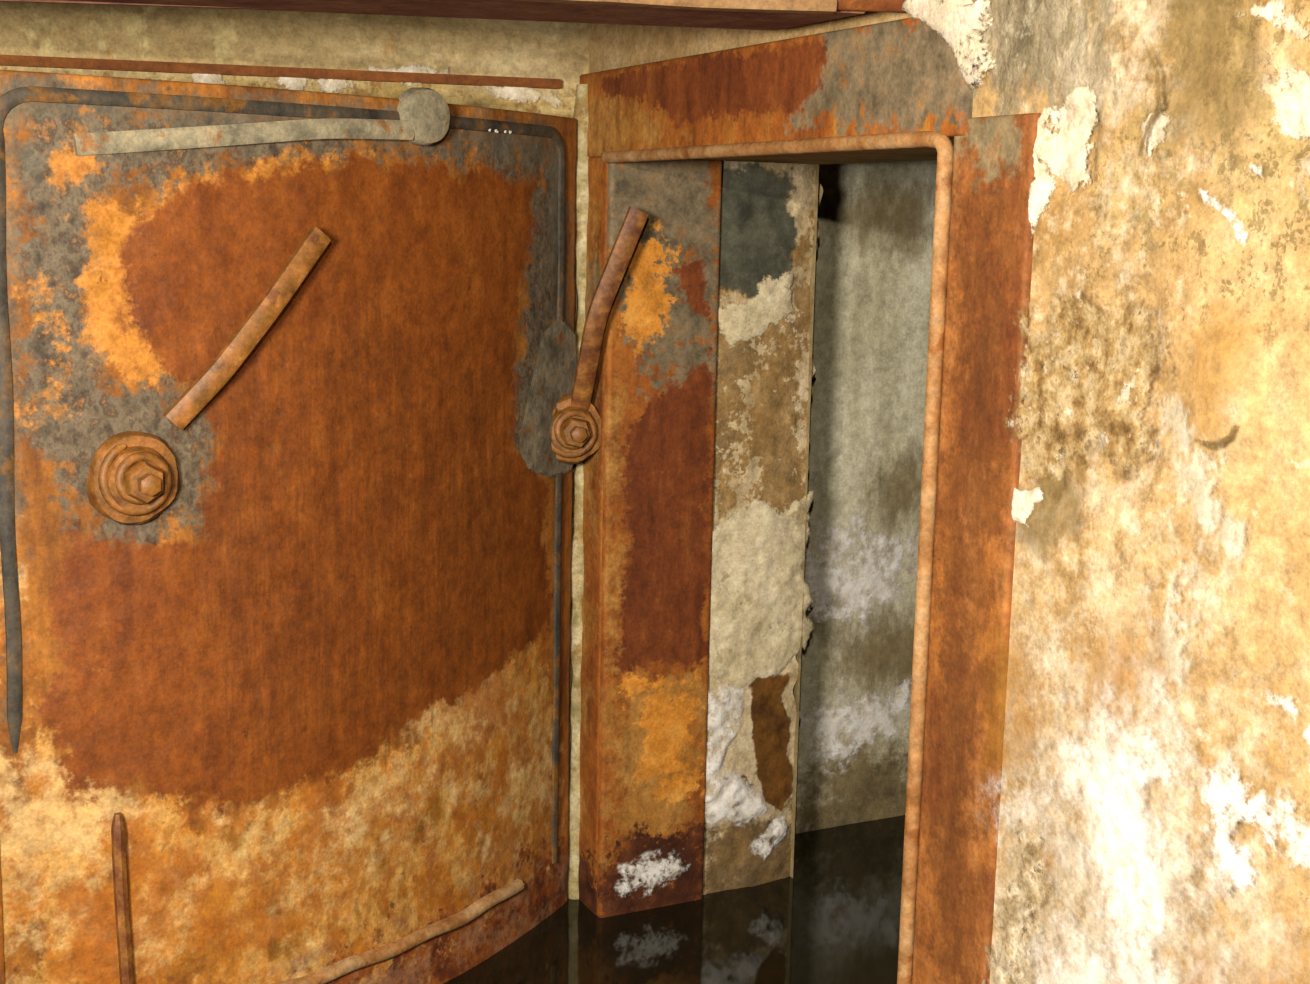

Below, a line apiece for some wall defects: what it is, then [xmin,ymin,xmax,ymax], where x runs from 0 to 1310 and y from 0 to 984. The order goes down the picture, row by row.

peeling [718,272,795,349]
efflorescence [1165,403,1244,557]
peeling [708,491,813,691]
corrosion [726,673,793,810]
efflorescence [1000,567,1310,984]
efflorescence [615,851,684,896]